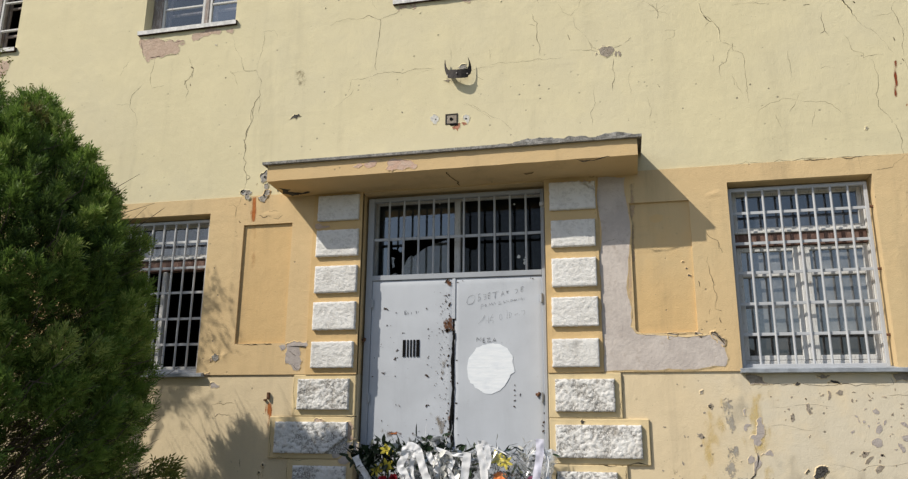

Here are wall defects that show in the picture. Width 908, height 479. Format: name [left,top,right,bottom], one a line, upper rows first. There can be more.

peeling [138,27,235,63]
crack [337,6,431,98]
flaking render [595,45,622,58]
crack [698,3,841,122]
crack [741,0,908,170]
spalling [240,169,309,203]
peeling [745,373,773,386]
water stain [723,402,736,433]
peeling [816,372,908,474]
peeling [728,408,774,475]
water stain [725,446,739,479]
spalling [804,465,830,479]